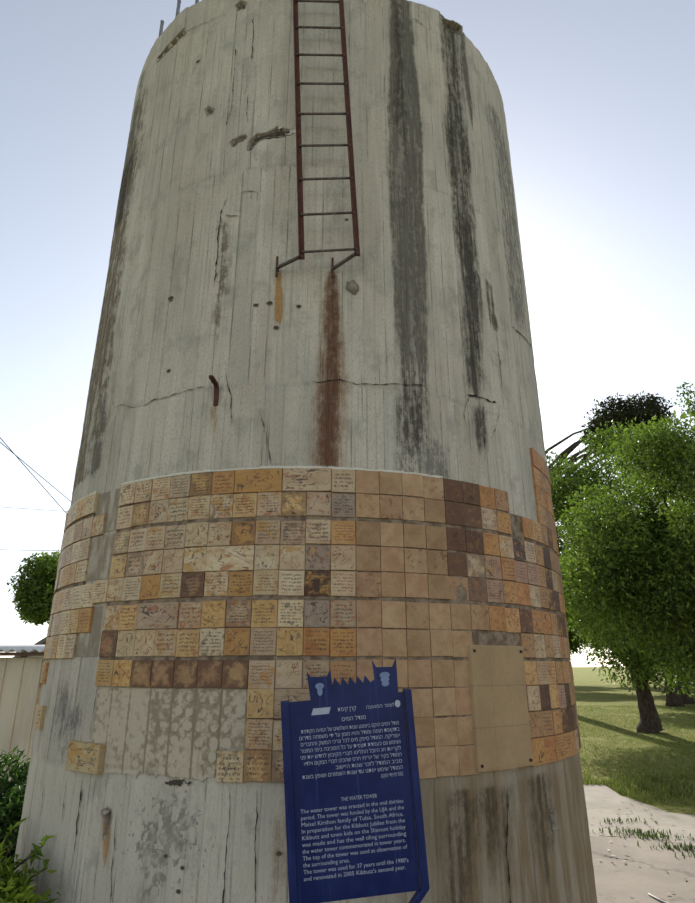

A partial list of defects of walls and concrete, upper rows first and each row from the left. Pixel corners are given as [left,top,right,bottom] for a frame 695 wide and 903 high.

spalling [156,28,186,62]
leakage [115,72,144,228]
spalling [229,126,296,150]
leakage [389,0,447,478]
leakage [441,15,498,398]
leakage [488,104,524,327]
rust [316,273,344,466]
crack [313,378,426,386]
leakage [475,409,486,448]